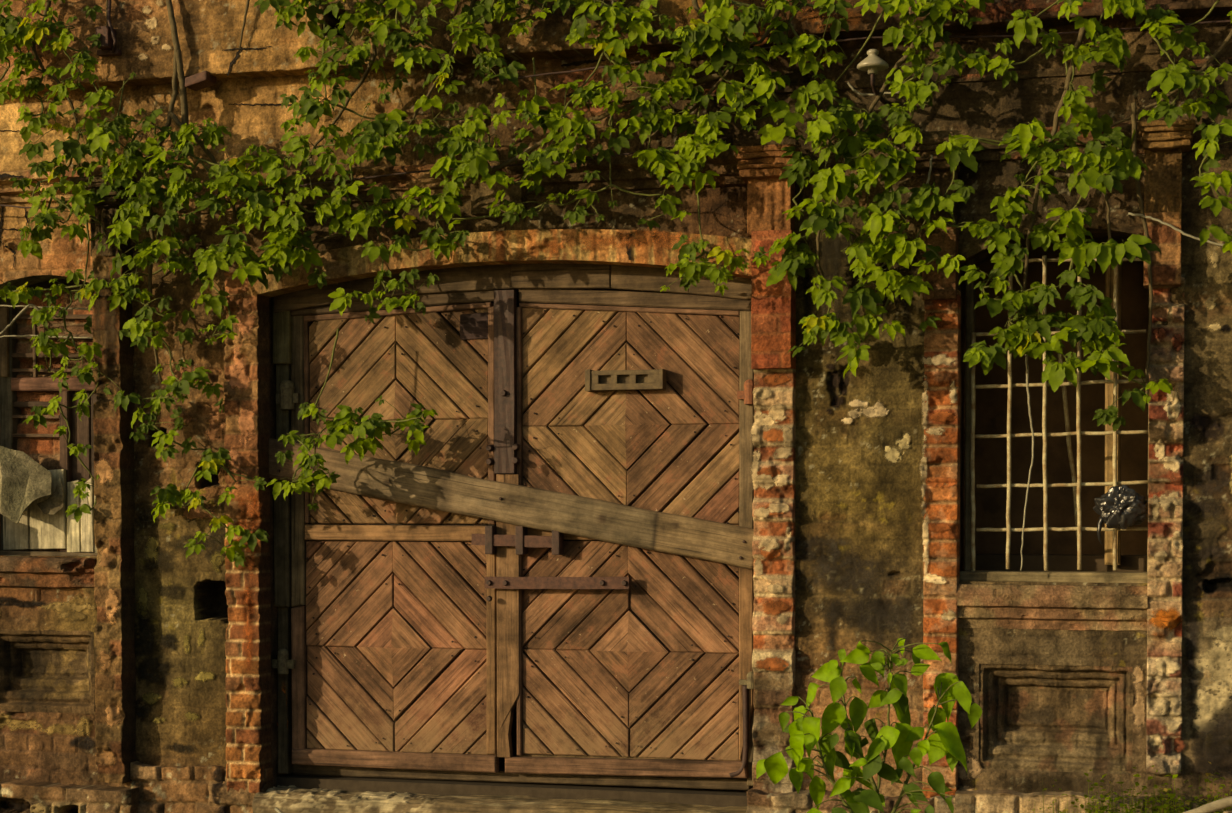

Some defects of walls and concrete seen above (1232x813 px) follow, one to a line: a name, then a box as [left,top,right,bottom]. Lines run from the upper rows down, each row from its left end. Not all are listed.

crack [0,173,28,269]
peeling [1210,241,1223,268]
peeling [1206,300,1230,332]
spalling [1151,439,1232,520]
spalling [1154,531,1223,560]
leakage [144,526,226,599]
spalling [1199,574,1232,592]
leakage [134,615,177,684]
leakage [166,744,193,753]